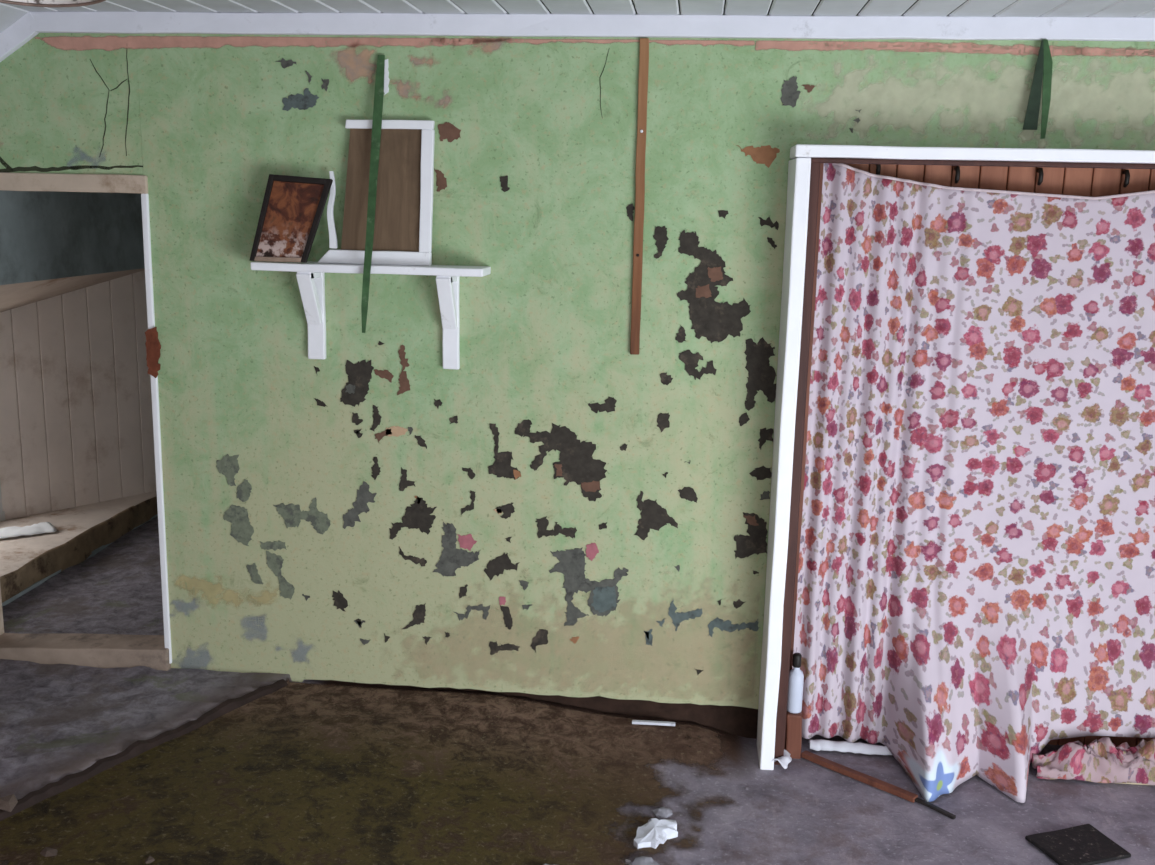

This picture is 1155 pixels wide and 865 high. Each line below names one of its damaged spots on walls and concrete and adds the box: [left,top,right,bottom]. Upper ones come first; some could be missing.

crack [0,50,143,173]
peeling [35,36,1155,111]
peeling [653,226,777,426]
peeling [340,345,427,449]
peeling [588,397,617,413]
peeling [216,454,310,601]
peeling [274,457,381,535]
peeling [389,419,607,655]
peeling [535,516,629,644]
peeling [634,491,678,540]
peeling [644,598,759,646]
peeling [734,512,768,559]